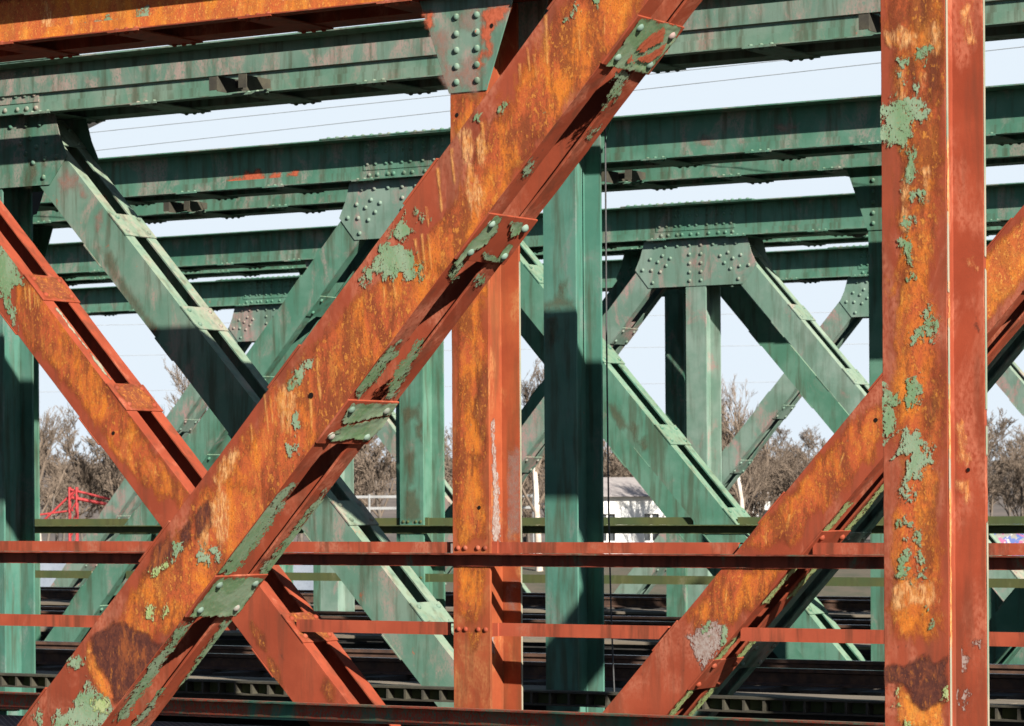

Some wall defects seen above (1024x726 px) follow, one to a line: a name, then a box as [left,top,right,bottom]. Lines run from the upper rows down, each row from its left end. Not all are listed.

corrosion [627,27,667,64]
peeling [880,0,949,283]
peeling [0,246,25,330]
peeling [357,207,432,289]
corrosion [0,0,643,702]
corrosion [750,0,969,726]
peeling [907,303,950,400]
peeling [823,484,884,531]
peeling [882,372,951,592]
peeling [31,482,332,726]
peeling [685,619,756,671]
peeling [669,687,718,716]